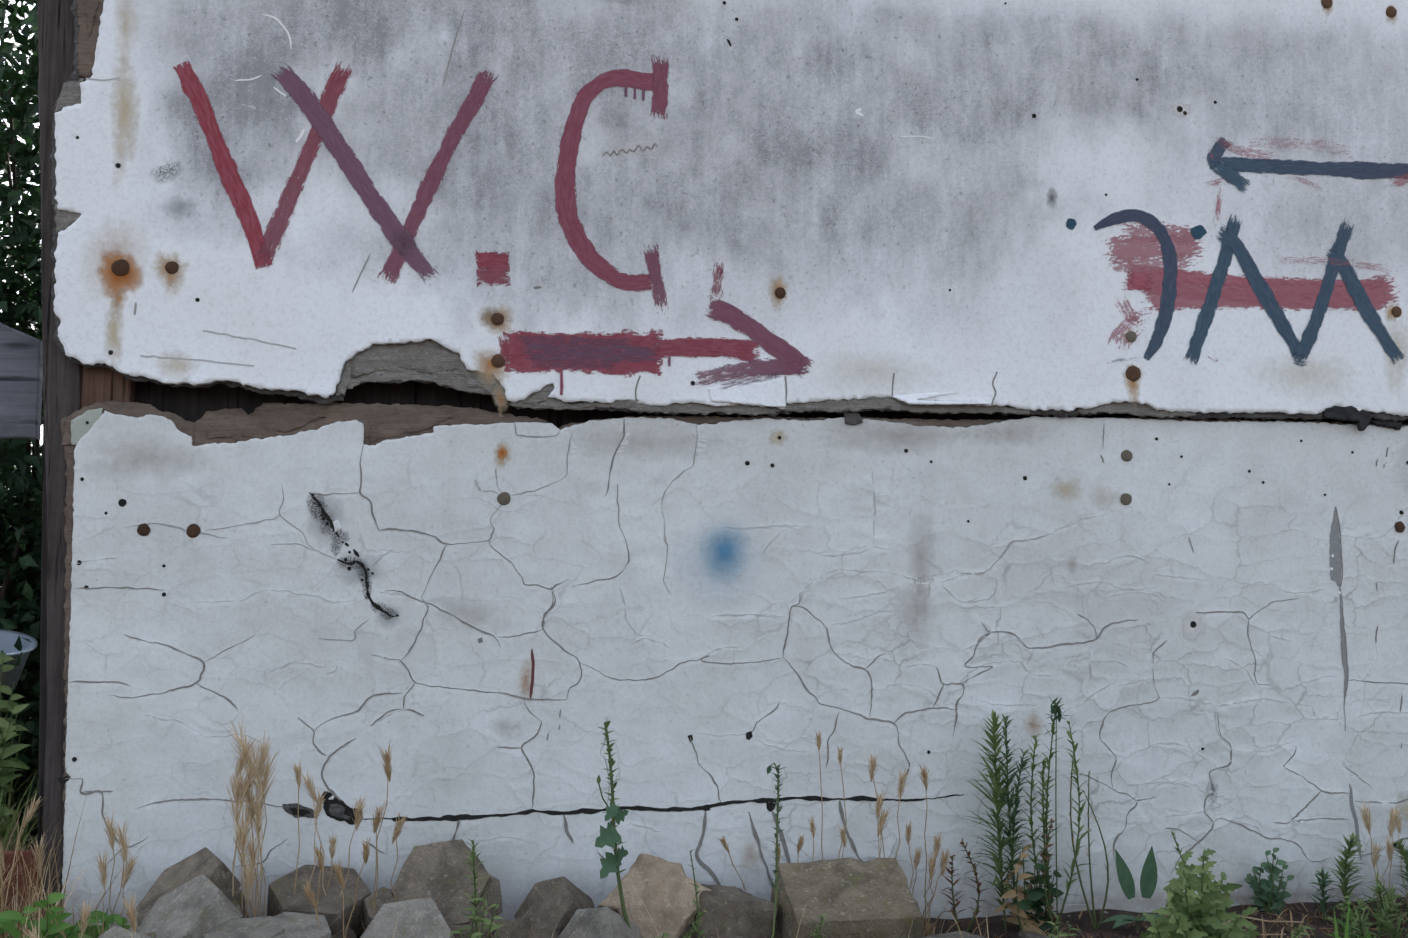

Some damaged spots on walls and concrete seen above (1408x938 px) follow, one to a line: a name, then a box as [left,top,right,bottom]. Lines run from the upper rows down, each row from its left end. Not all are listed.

damp [117,84,132,151]
corrosion [101,255,139,307]
spalling [61,340,1030,446]
corrosion [497,446,507,464]
crack [73,584,159,592]
crack [129,372,1408,885]
crack [69,634,252,708]
crack [65,778,290,873]